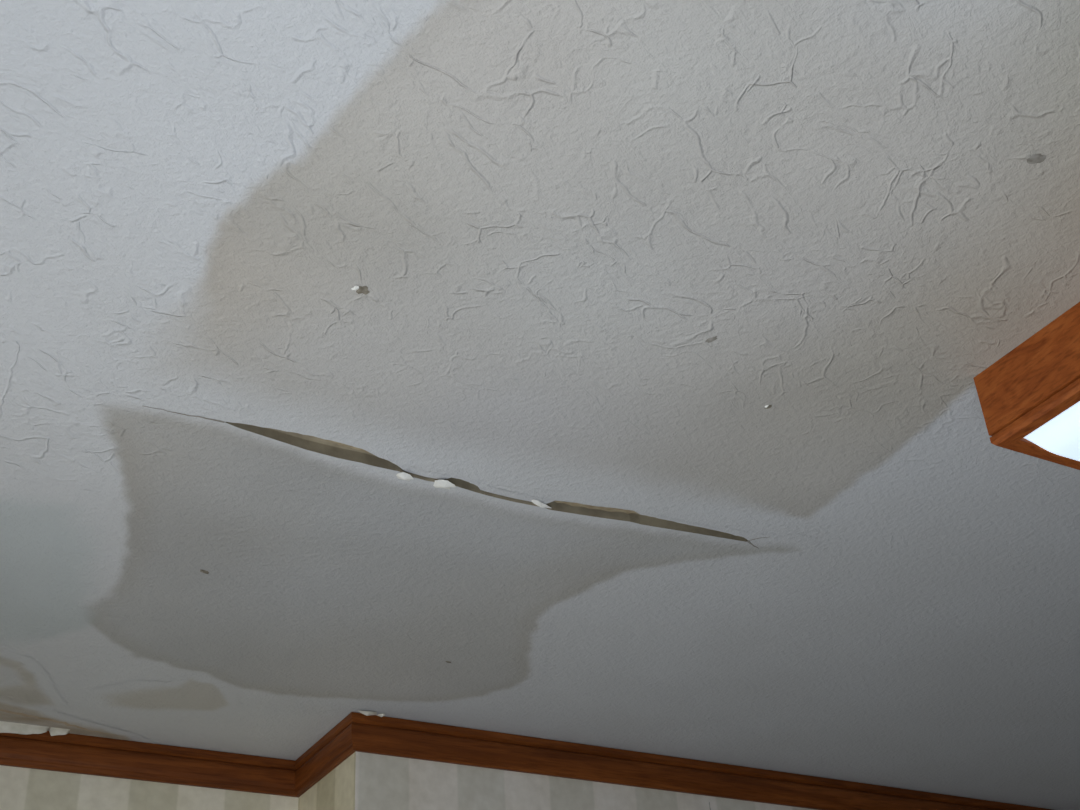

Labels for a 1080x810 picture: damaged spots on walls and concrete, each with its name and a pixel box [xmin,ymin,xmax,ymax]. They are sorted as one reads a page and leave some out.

leakage [104,0,1080,527]
leakage [60,388,820,717]
crack [144,406,768,549]
peeling [0,721,70,736]